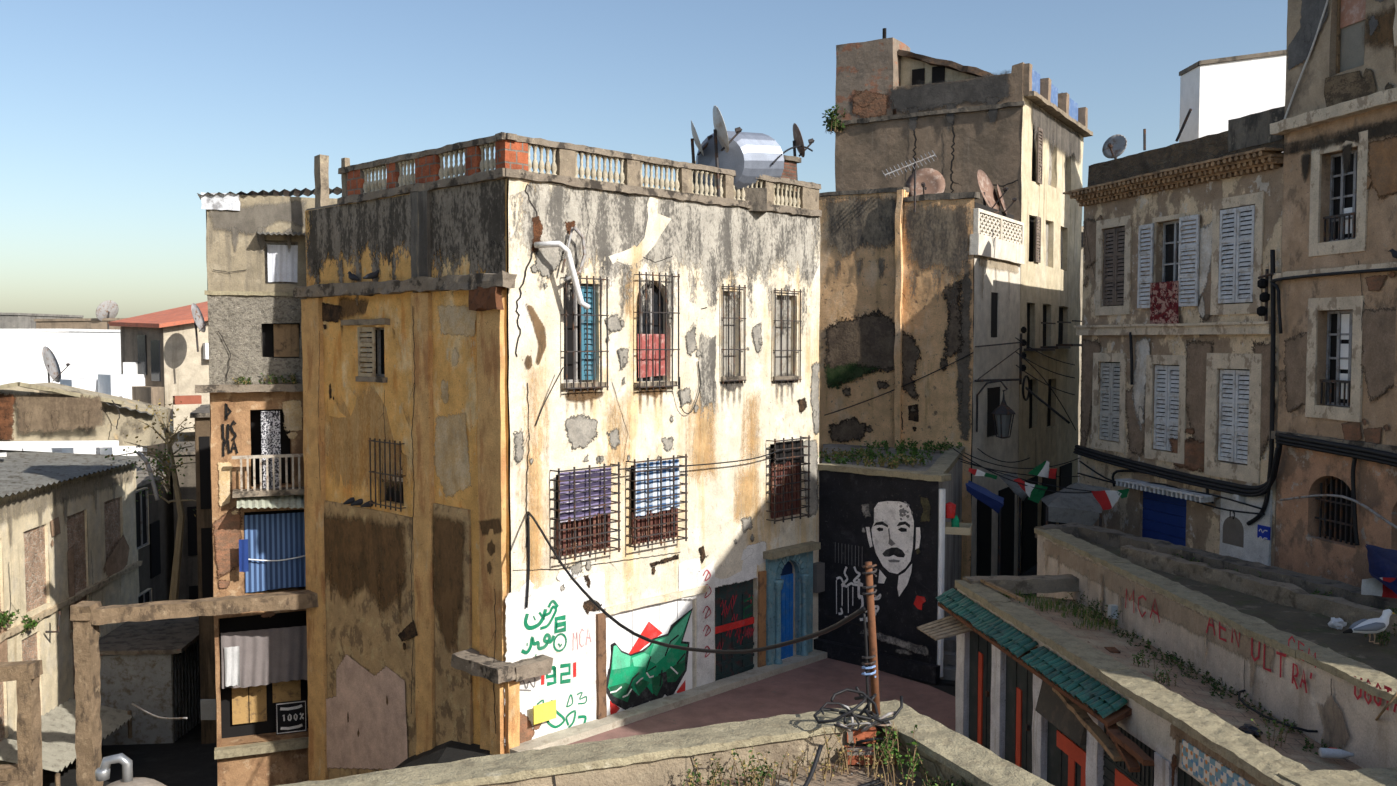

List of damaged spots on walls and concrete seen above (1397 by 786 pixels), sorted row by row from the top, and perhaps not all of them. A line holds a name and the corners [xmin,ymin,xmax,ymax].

water stain [210,194,411,329]
water stain [430,179,1019,441]
peeling [940,280,965,371]
peeling [565,413,630,464]
peeling [657,387,699,459]
peeling [797,309,922,517]
peeling [899,495,931,522]
water stain [324,515,406,623]
water stain [432,516,465,652]
peeling [326,654,408,770]